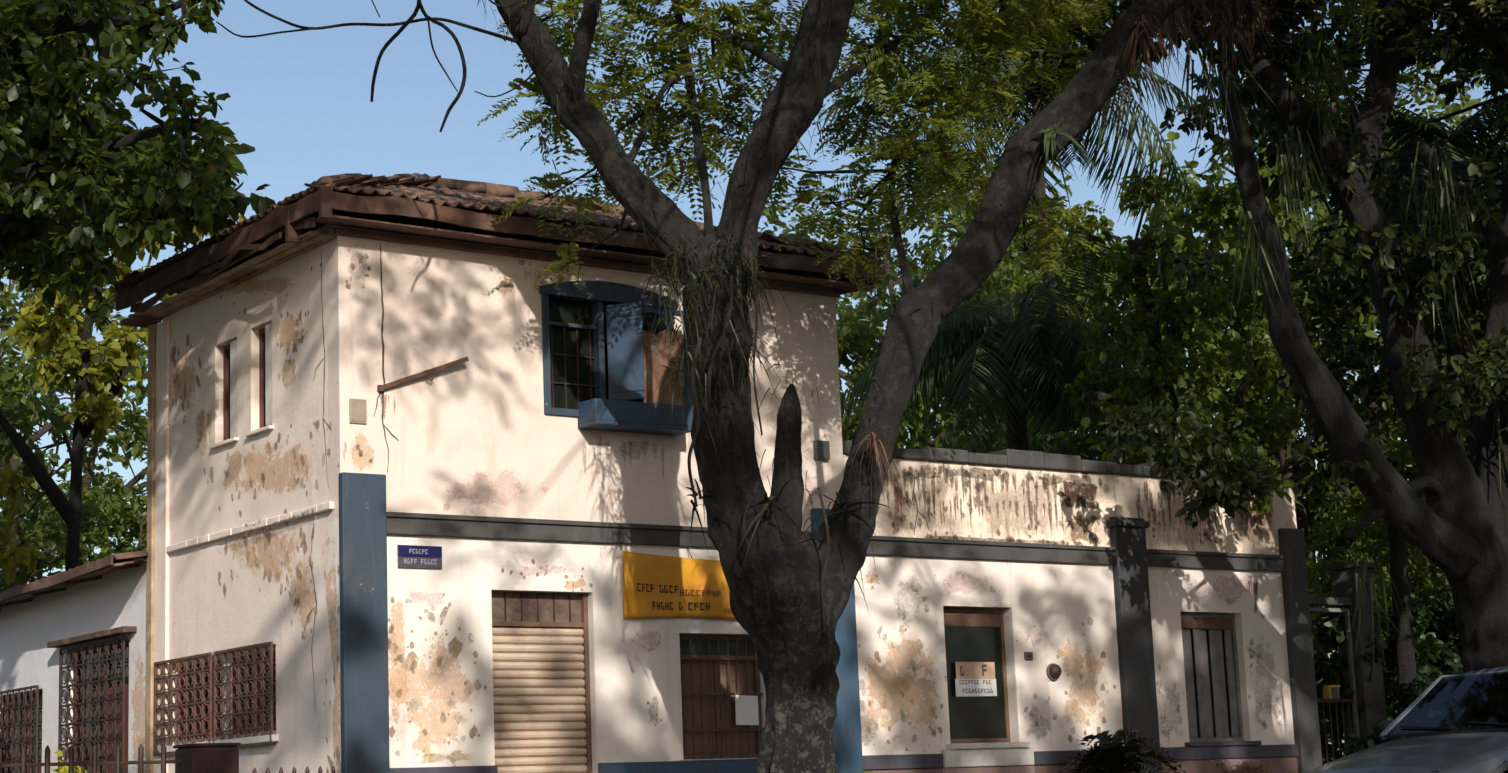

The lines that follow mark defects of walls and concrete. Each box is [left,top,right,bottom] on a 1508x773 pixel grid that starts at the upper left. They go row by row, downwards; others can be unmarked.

peeling [171,335,201,422]
crack [373,244,399,472]
leakage [886,465,1102,546]
peeling [204,420,347,773]
peeling [388,593,487,764]
peeling [858,626,946,753]
peeling [1047,617,1116,742]